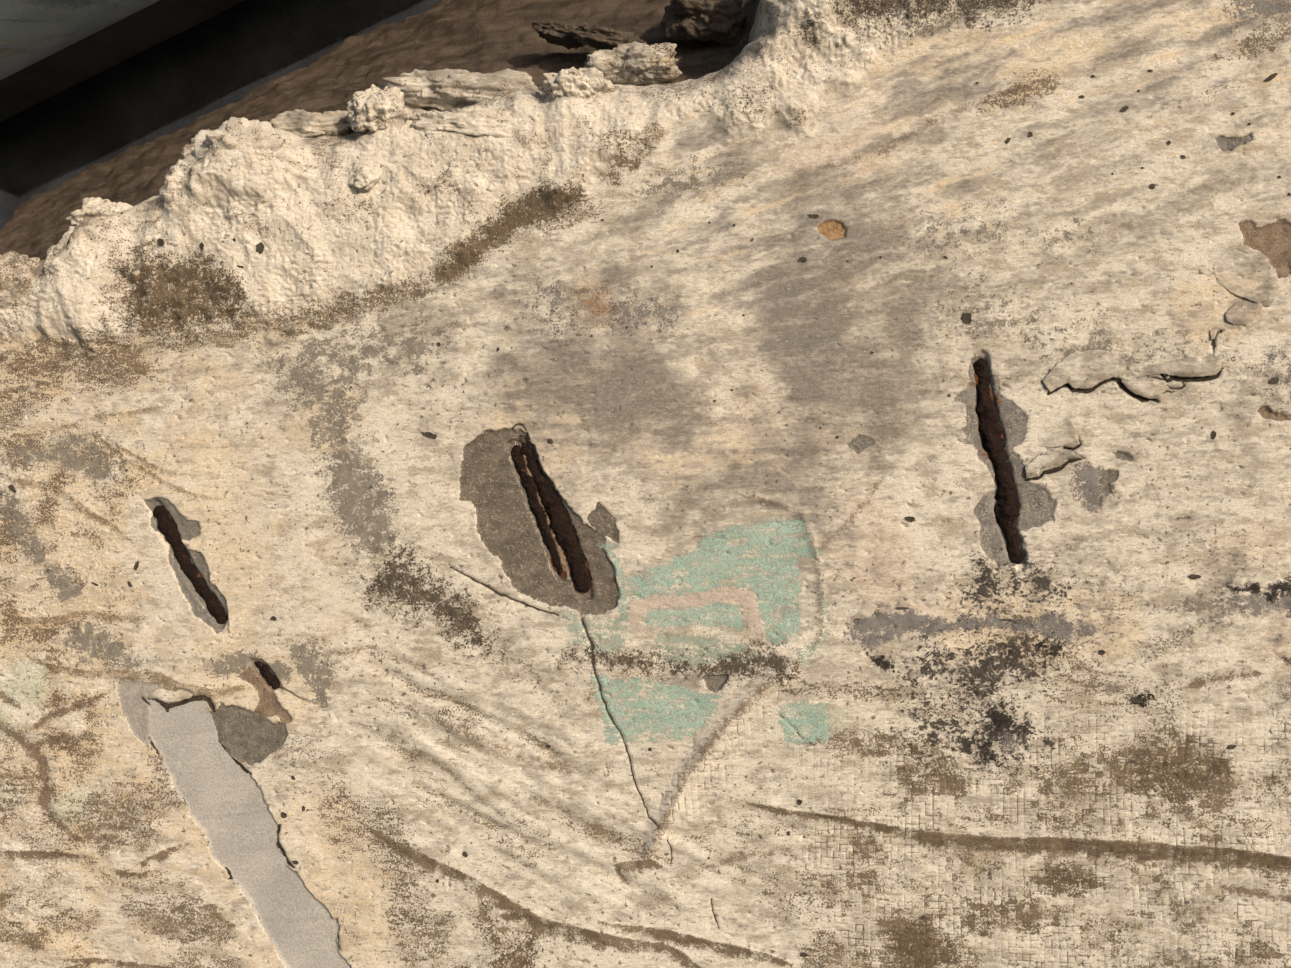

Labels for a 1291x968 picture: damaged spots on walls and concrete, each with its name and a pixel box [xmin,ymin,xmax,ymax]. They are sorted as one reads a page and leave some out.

spalling [807,214,847,240]
peeling [1213,219,1291,326]
peeling [1042,350,1222,399]
spalling [948,356,1084,567]
spalling [145,497,228,634]
spalling [459,428,620,615]
spalling [118,677,194,746]
spalling [209,661,308,766]